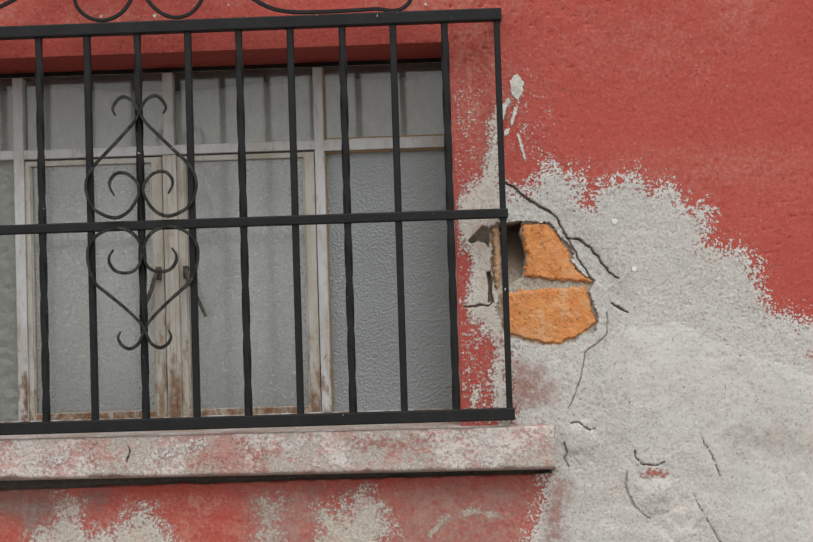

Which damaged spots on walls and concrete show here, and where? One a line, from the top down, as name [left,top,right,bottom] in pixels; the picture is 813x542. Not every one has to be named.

crack [505,182,619,279]
crack [466,271,494,308]
peeling [453,70,813,542]
peeling [23,490,182,542]
peeling [246,485,294,542]
peeling [301,483,404,542]
peeling [427,506,499,538]